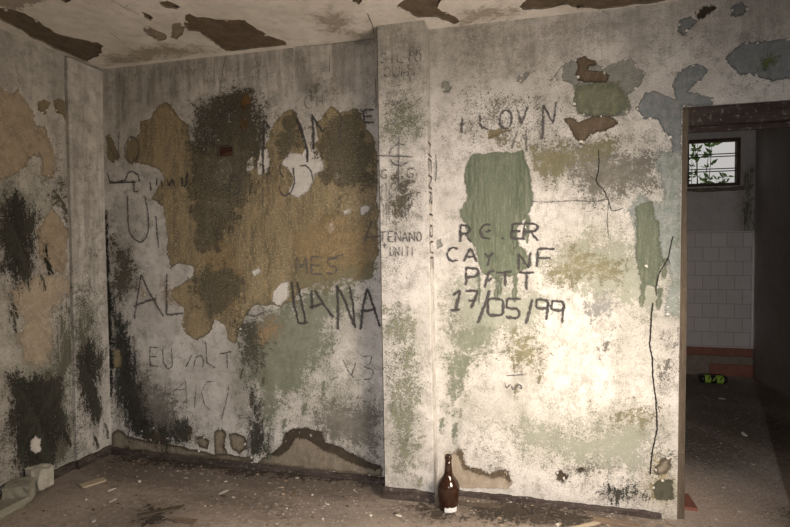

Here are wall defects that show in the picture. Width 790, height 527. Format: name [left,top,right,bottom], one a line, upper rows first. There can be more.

spalling [0,0,102,60]
spalling [143,1,286,50]
spalling [396,0,459,23]
spalling [521,0,658,11]
damp [0,184,54,333]
damp [46,175,68,229]
peeling [106,96,381,344]
crack [588,149,623,236]
peeling [562,56,745,319]
damp [0,210,402,488]
crack [649,230,693,475]
spalling [112,426,383,477]